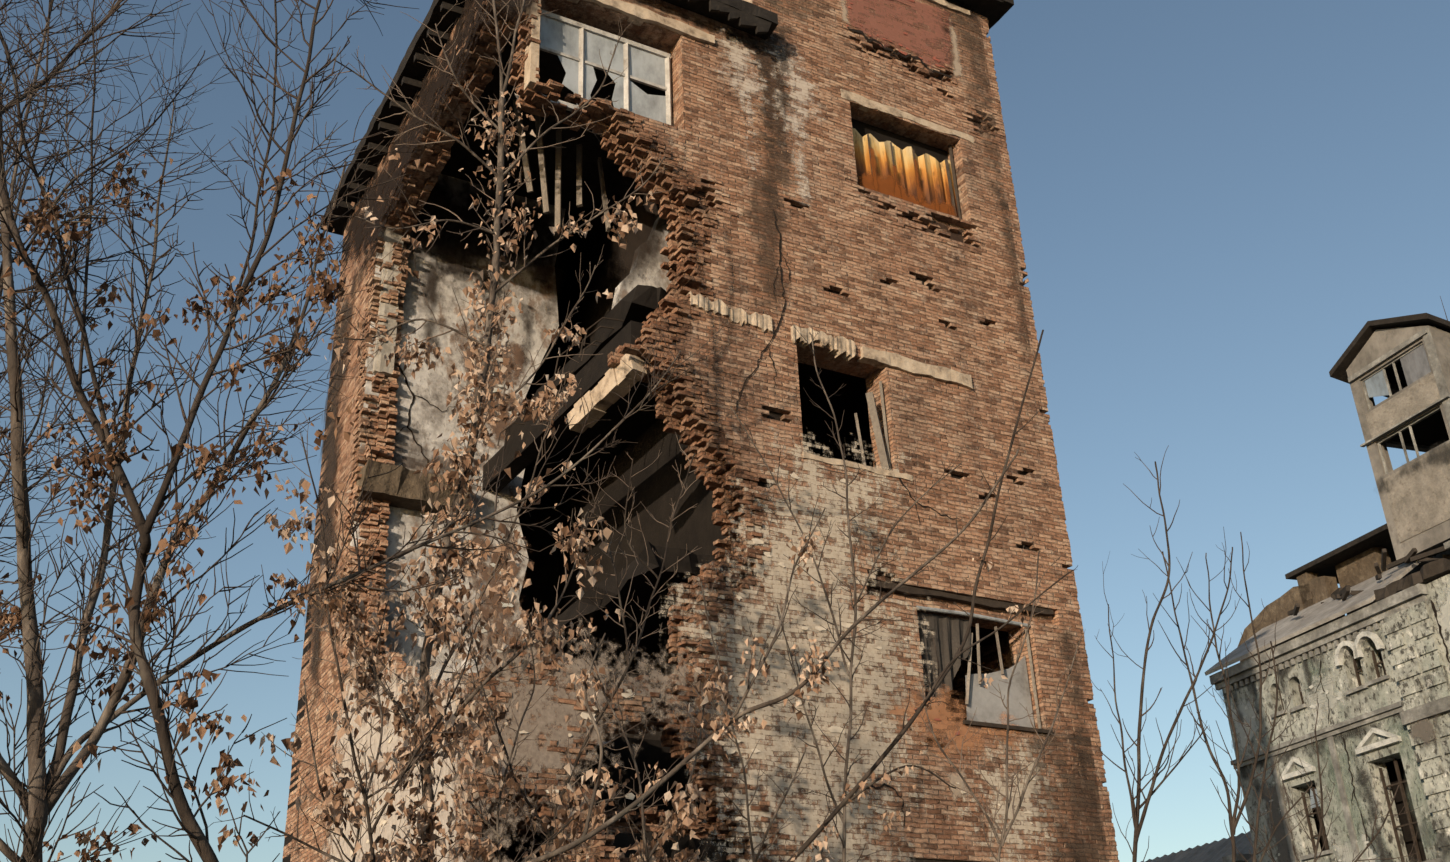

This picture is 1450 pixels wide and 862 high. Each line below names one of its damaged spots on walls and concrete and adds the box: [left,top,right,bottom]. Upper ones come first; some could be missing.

spalling [546,79,564,94]
spalling [595,99,630,122]
leakage [718,26,815,305]
spalling [682,191,721,214]
spalling [675,230,694,241]
spalling [878,205,967,244]
spalling [677,275,703,290]
spalling [621,343,641,356]
peeling [323,410,1066,862]
leakage [1220,631,1385,723]
leakage [1240,714,1402,862]